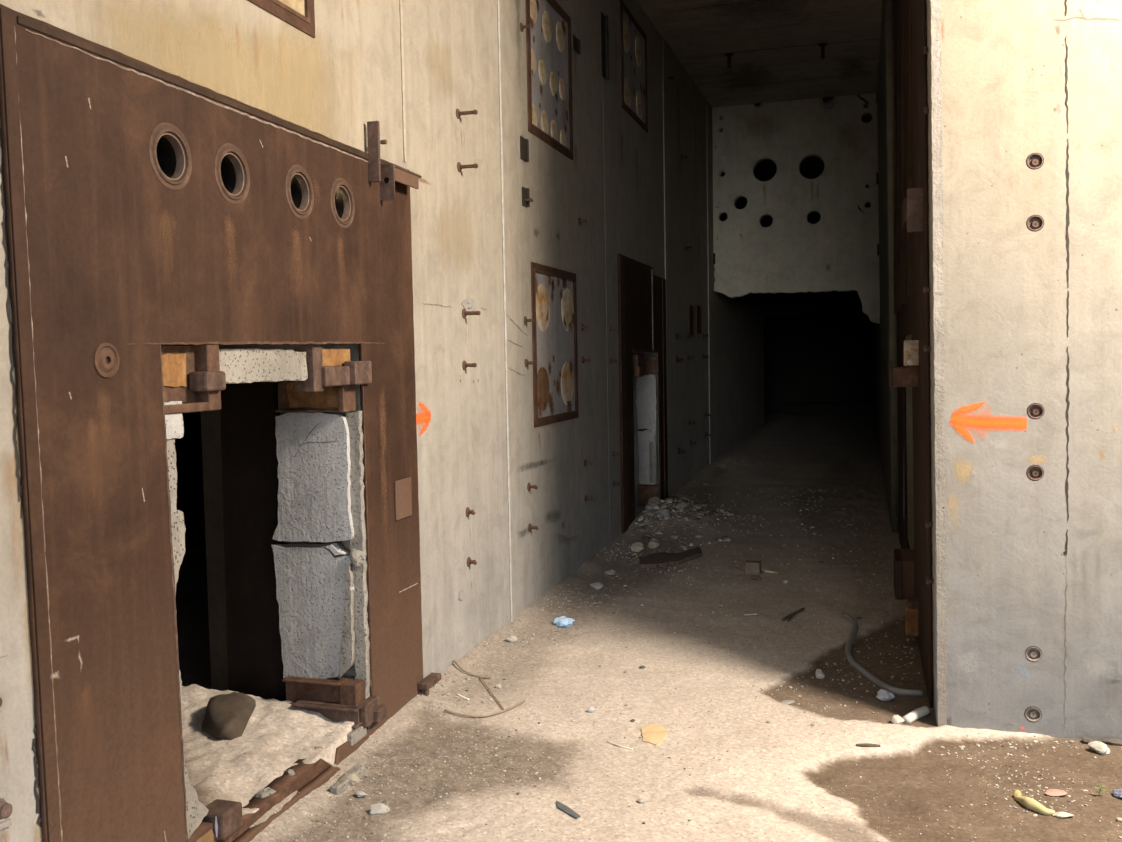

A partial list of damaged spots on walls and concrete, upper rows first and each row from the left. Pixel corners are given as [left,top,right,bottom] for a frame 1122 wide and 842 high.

rust [156,23,321,131]
crack [1054,0,1122,728]